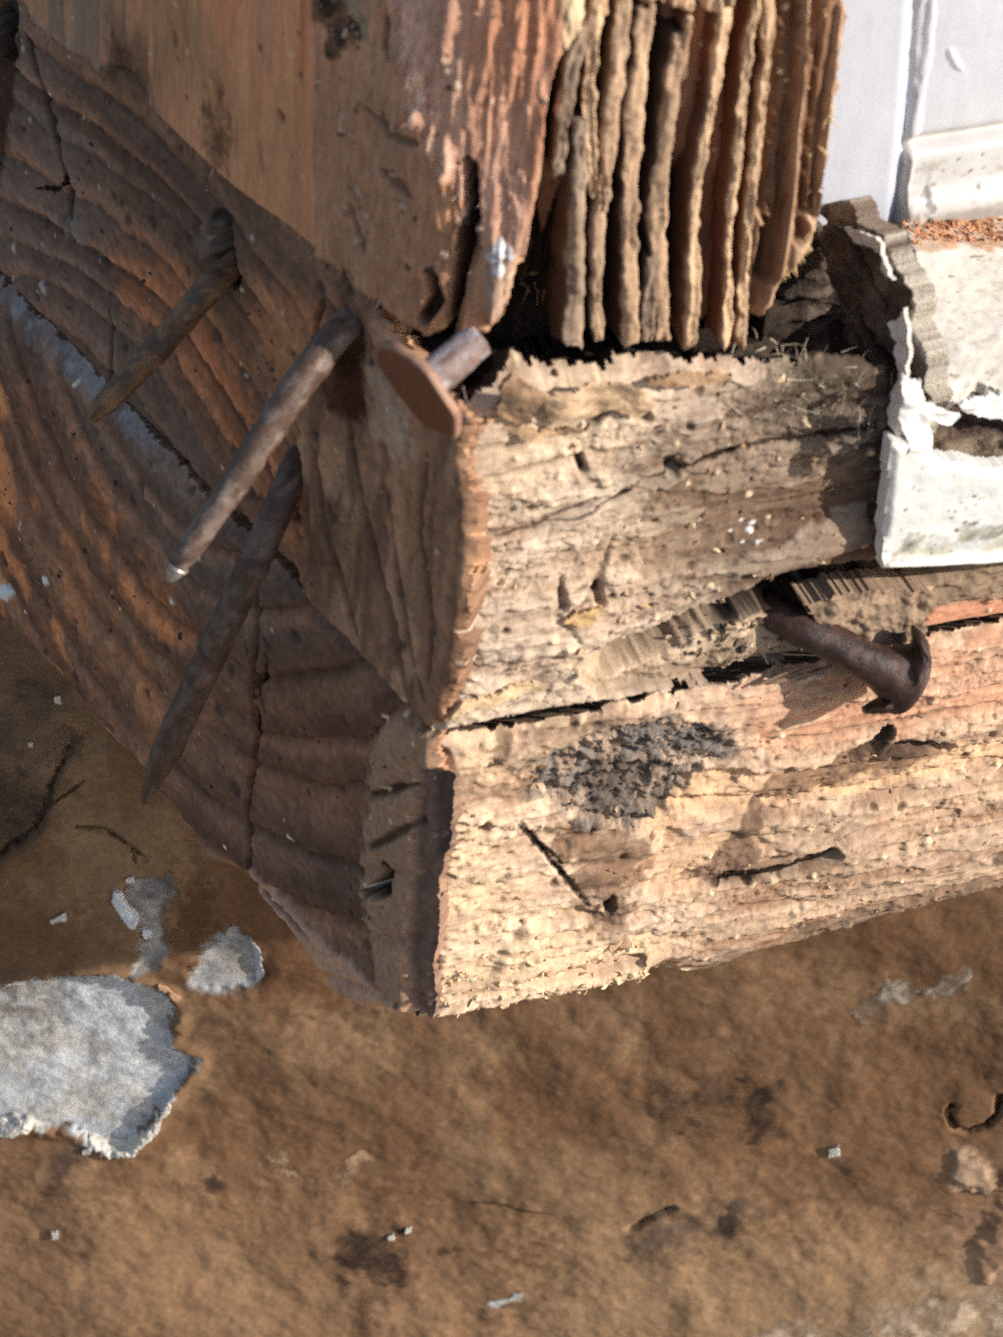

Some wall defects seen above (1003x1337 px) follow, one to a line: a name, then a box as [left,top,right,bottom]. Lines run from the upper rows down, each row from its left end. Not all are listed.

peeling [845,226,897,281]
rust [327,341,365,421]
peeling [886,307,1003,457]
damp [492,731,514,763]
damp [519,714,740,931]
crack [716,849,832,886]